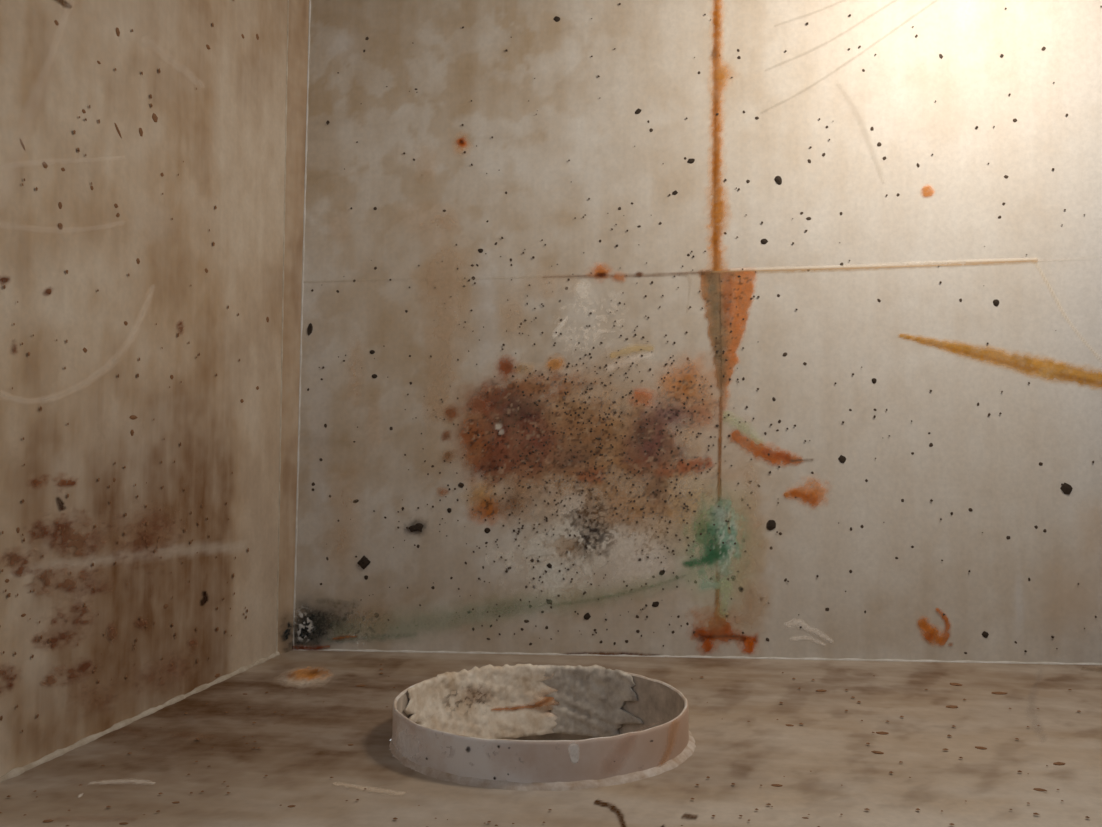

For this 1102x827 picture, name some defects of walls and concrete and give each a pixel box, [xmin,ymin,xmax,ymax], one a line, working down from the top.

rust [443,0,813,518]
rust [900,334,1102,387]
rust [784,482,824,506]
rust [6,553,30,575]
rust [30,521,105,556]
rust [40,569,102,594]
leakage [684,500,740,588]
rust [33,605,89,649]
leakage [282,603,399,650]
rust [693,562,757,653]
rust [918,608,952,646]